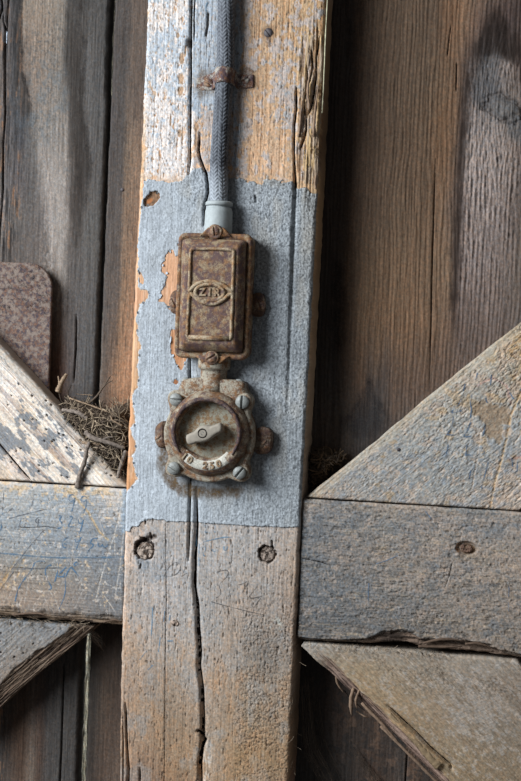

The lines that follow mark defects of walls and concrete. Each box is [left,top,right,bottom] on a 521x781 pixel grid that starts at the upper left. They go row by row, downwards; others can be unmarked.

crack [294,44,319,188]
spalling [138,191,160,226]
peeling [127,238,178,490]
peeling [170,330,187,384]
rust [158,448,239,497]
crack [188,479,207,781]